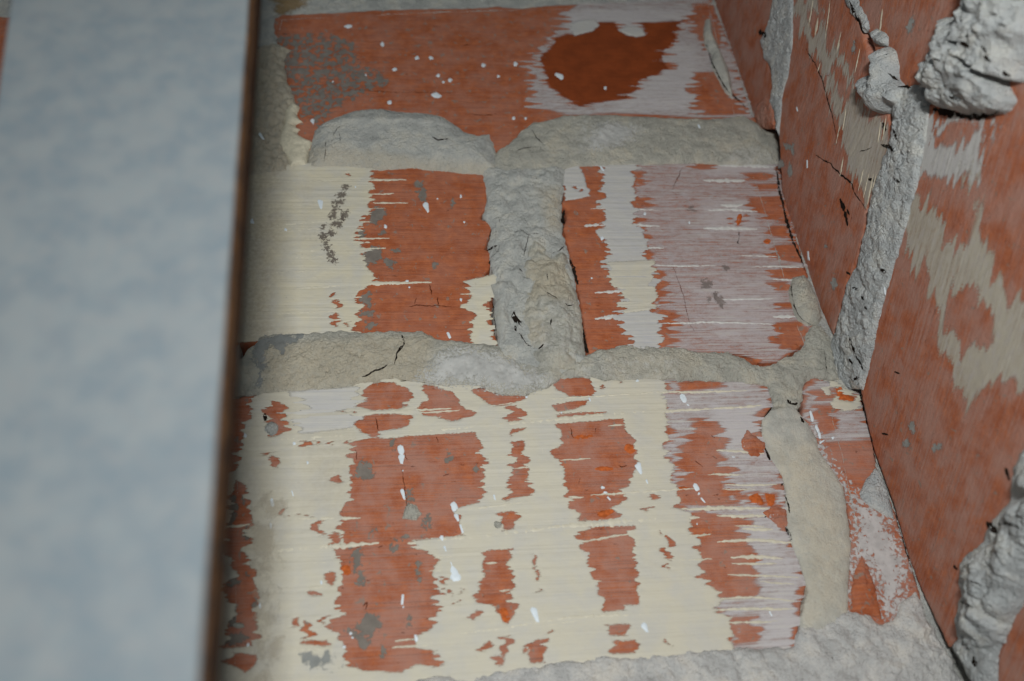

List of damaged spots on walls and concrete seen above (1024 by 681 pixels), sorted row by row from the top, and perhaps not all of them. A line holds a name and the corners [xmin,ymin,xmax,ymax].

peeling [539,19,684,107]
crack [806,49,836,133]
crack [362,335,406,381]
spalling [836,387,854,401]
spalling [741,430,765,457]
spalling [748,493,788,531]
spalling [850,557,882,620]
spalling [500,608,510,623]